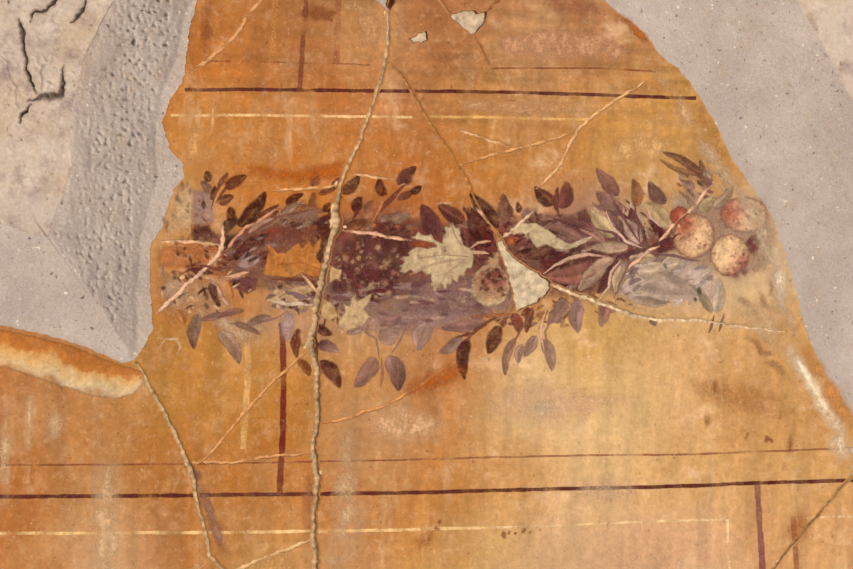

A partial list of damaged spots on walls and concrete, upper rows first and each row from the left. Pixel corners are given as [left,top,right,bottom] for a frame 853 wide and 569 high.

spalling [16,0,68,124]
spalling [71,0,89,25]
flaking render [409,29,430,44]
flaking render [450,9,488,36]
crack [135,0,646,569]
flaking render [493,229,553,313]
crack [627,188,708,271]
crack [550,282,786,334]
peeling [742,194,787,312]
peeling [0,330,144,398]
peeling [791,350,847,455]
crack [771,473,853,569]